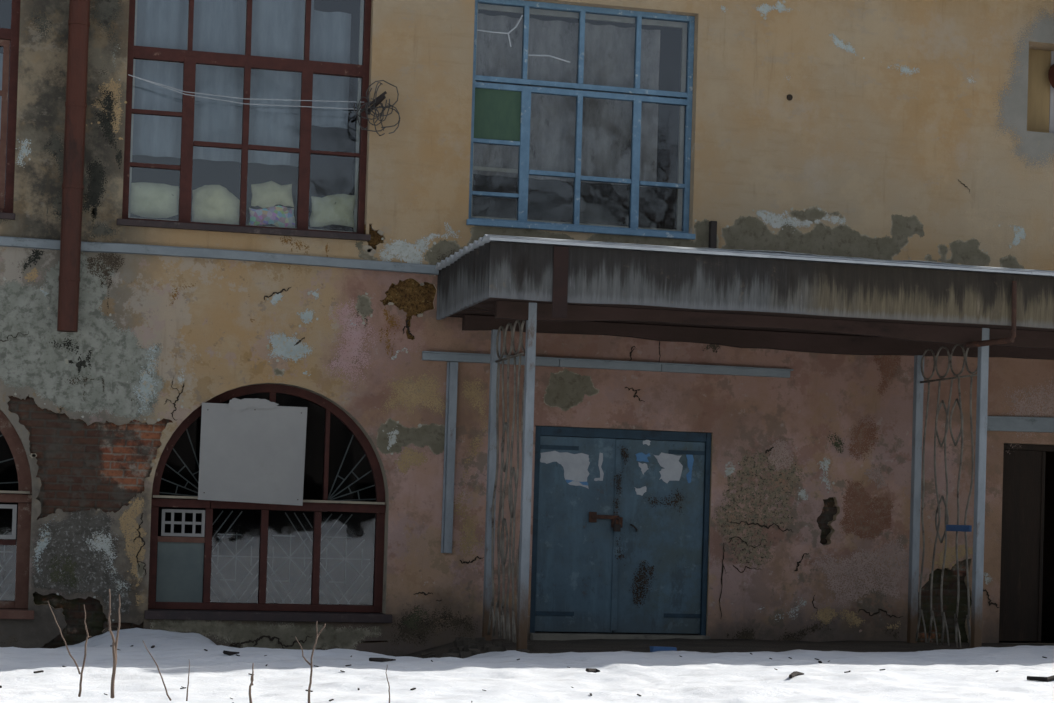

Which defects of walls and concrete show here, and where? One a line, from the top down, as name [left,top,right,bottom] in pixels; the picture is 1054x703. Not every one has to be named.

damp [82,70,122,239]
damp [83,253,124,313]
flaking render [350,205,924,360]
flaking render [924,224,1026,269]
peeling [266,289,319,377]
crack [165,381,184,420]
flaking render [376,417,445,455]
flaking render [7,393,397,650]
flaking render [817,458,837,544]